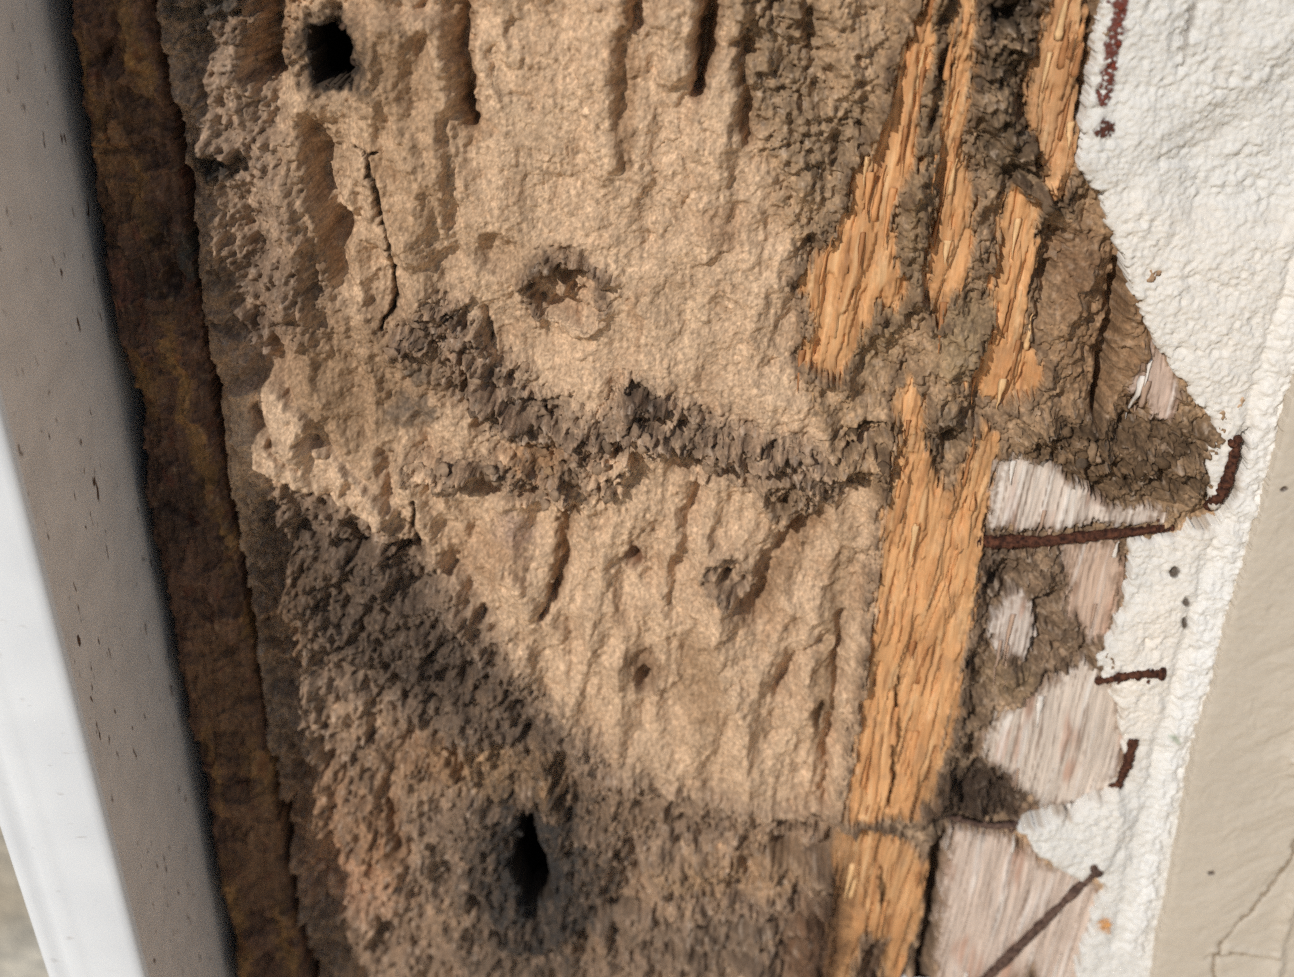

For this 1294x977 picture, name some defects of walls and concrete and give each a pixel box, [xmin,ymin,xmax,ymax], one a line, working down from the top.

peeling [977,0,1018,83]
corrosion [1094,0,1129,138]
leakage [193,147,246,185]
peeling [1026,160,1052,203]
crack [363,151,400,329]
peeling [1057,423,1189,481]
leakage [458,762,620,977]
leakage [810,893,846,977]